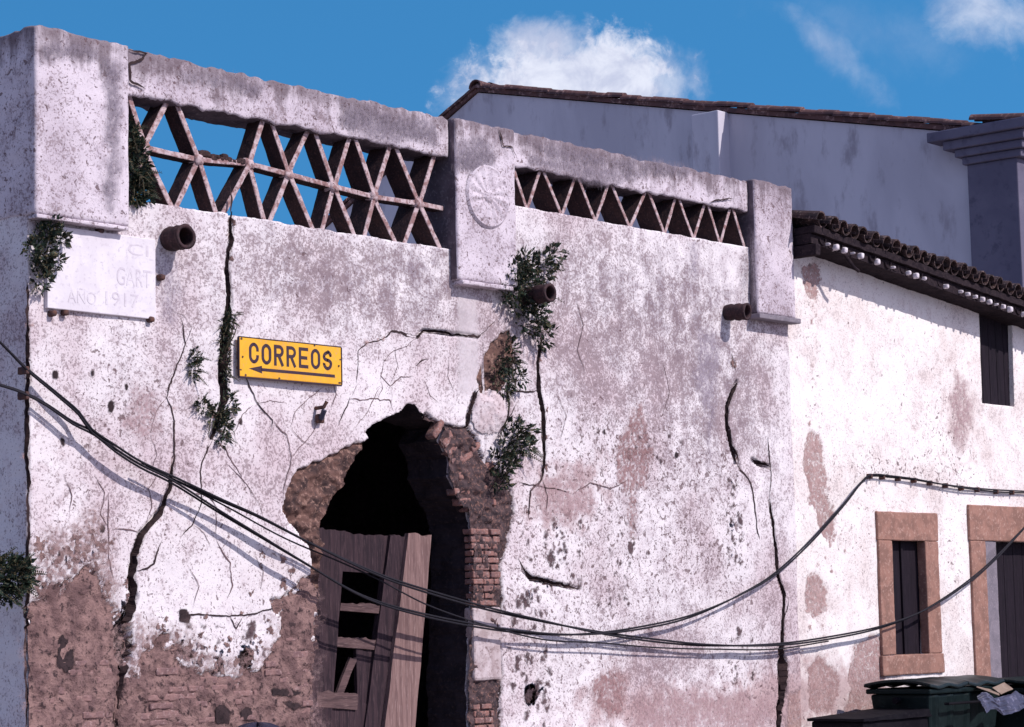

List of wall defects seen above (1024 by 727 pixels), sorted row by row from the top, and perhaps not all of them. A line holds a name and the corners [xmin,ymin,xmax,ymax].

crack [113,650,132,727]
flaking render [27,442,362,727]
crack [97,186,496,629]
spalling [423,414,513,727]
spalling [476,330,516,393]
crack [518,558,581,590]
crack [501,339,627,517]
crack [724,355,789,727]